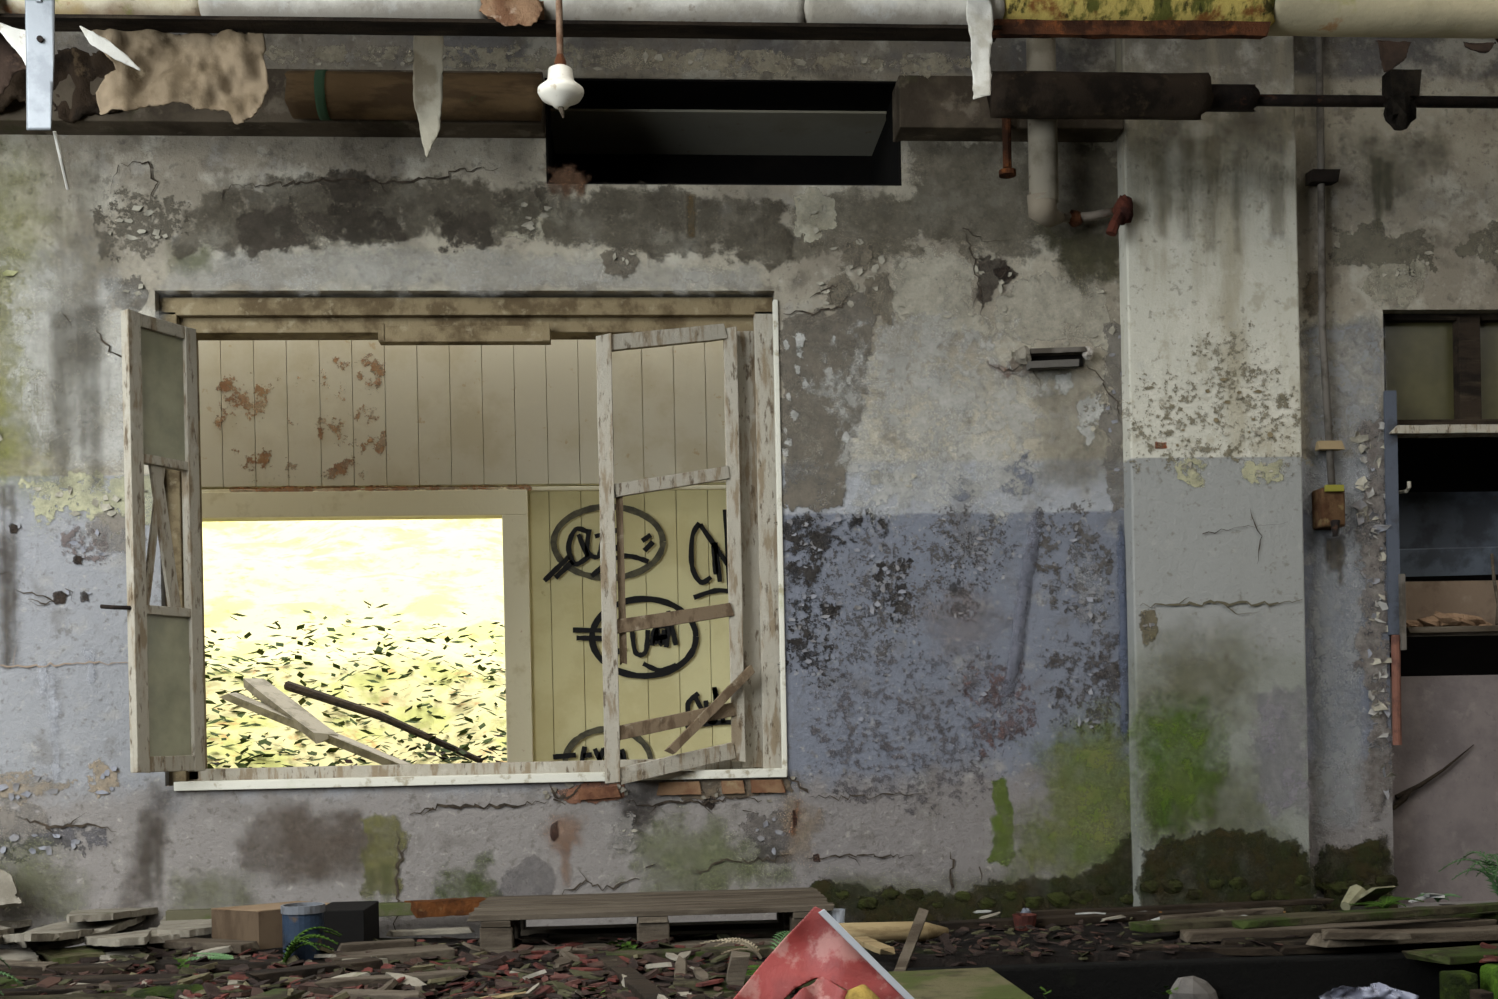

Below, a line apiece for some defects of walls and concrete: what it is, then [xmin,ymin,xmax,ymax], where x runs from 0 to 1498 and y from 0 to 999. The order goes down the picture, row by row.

corrosion [992,19,1271,40]
damp [173,141,1120,294]
damp [7,269,124,465]
peeling [215,372,279,427]
peeling [232,447,296,481]
peeling [315,353,387,480]
peeling [656,187,1314,865]
crack [1140,597,1302,614]